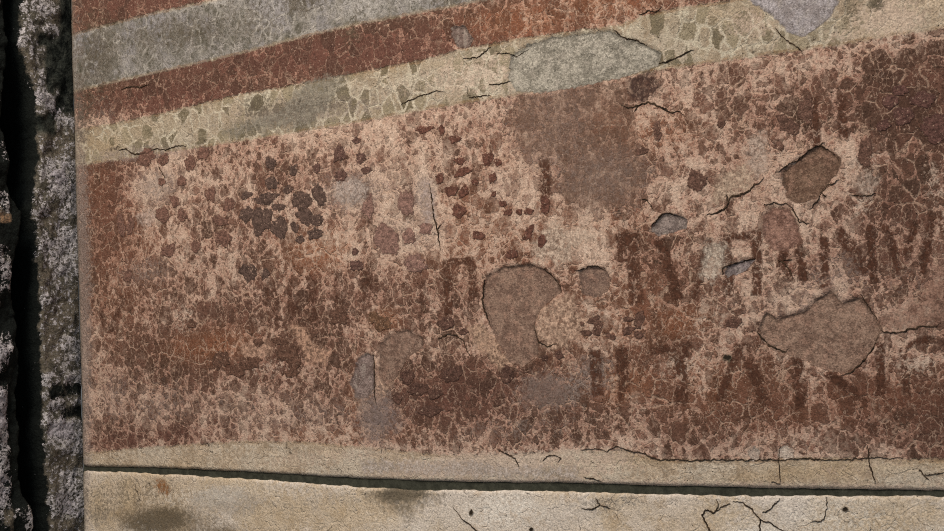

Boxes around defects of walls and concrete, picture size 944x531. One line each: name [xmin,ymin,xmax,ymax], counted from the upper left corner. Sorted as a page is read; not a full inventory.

flaking render [751,0,839,37]
peeling [508,30,662,94]
peeling [415,125,462,144]
crack [621,101,682,114]
peeling [653,120,662,141]
peeling [687,94,814,204]
peeling [858,137,878,193]
peeling [762,147,841,251]
peeling [435,153,645,383]
peeling [723,317,742,328]
peeling [375,361,463,417]
crack [543,446,943,531]